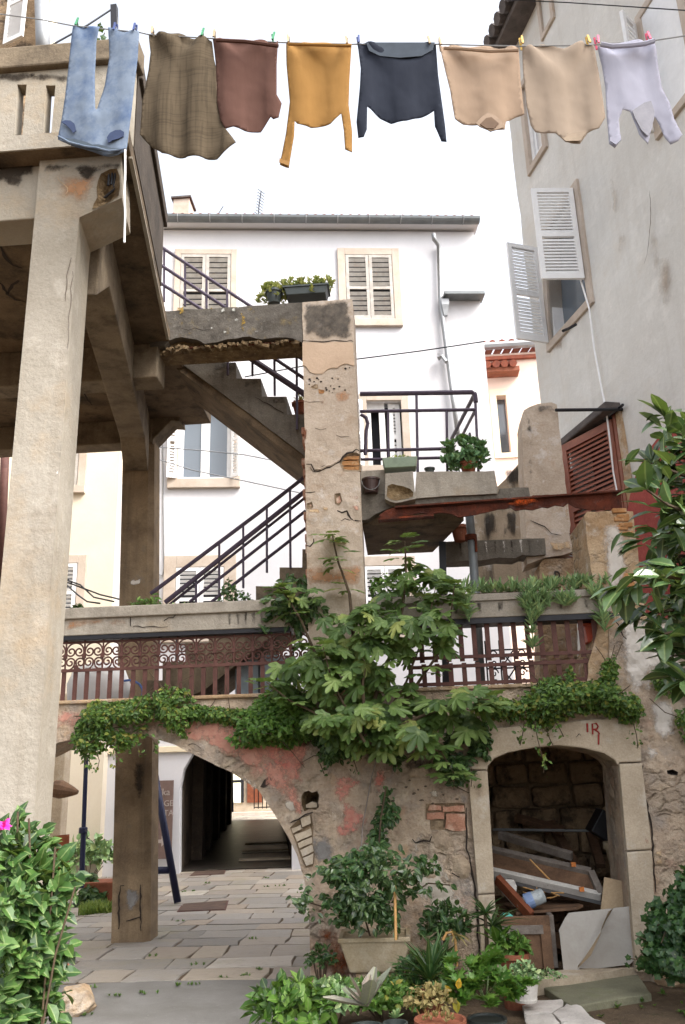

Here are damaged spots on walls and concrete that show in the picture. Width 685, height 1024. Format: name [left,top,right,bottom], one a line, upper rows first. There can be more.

leakage [0,165,33,184]
leakage [77,164,119,179]
peeling [162,339,354,394]
crack [305,428,359,493]
leakage [505,468,518,482]
leakage [484,511,530,551]
spalling [405,779,466,832]
peeling [417,860,467,938]